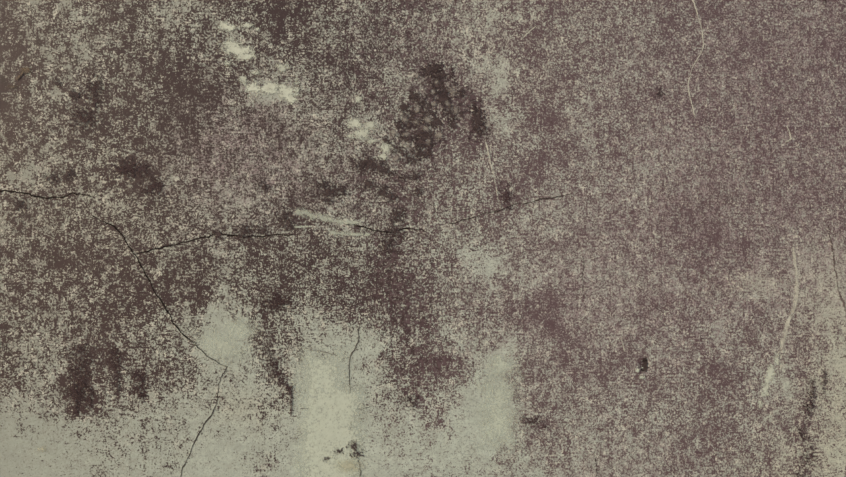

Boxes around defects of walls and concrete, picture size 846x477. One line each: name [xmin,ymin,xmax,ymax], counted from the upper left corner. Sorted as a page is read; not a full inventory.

crack [344,223,426,233]
crack [449,194,568,224]
crack [828,225,846,312]
crack [0,190,293,476]
crack [314,330,359,392]
peeling [296,350,365,477]